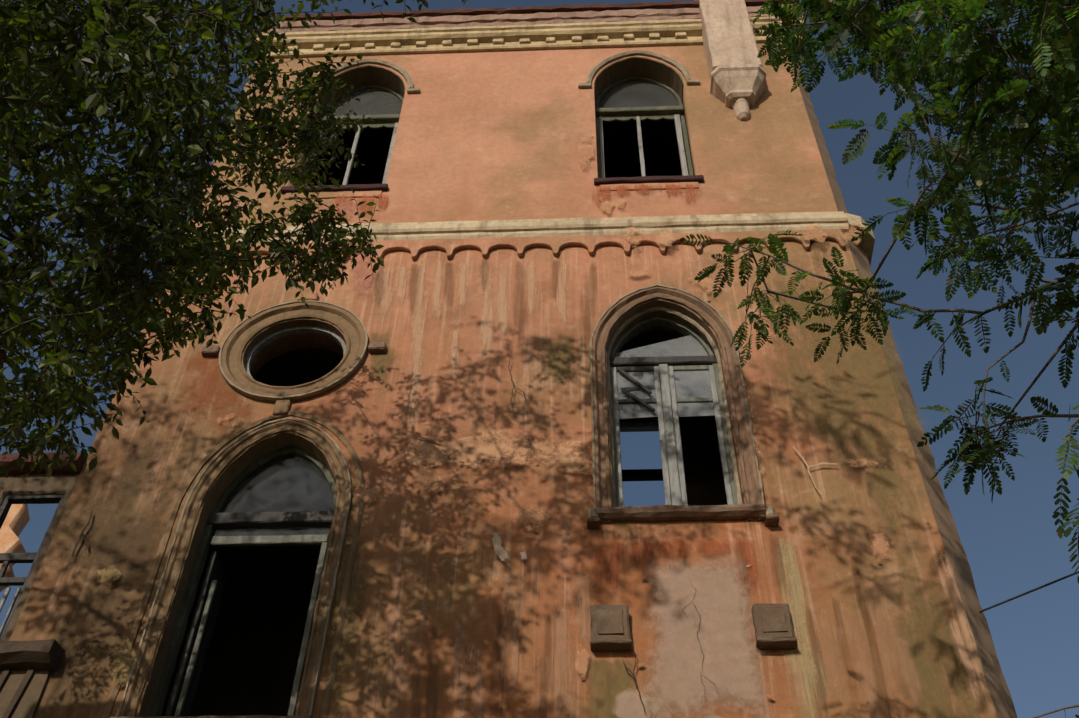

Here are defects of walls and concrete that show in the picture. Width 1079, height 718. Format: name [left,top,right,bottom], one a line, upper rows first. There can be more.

peeling [658,230,676,246]
leakage [354,257,442,428]
leakage [480,263,508,360]
leakage [557,263,567,321]
leakage [772,289,901,506]
peeling [404,429,591,492]
spalling [97,566,121,585]
spalling [489,532,527,564]
leakage [453,627,483,718]
crack [682,580,718,700]
leakage [777,539,826,718]
leakage [904,554,986,718]